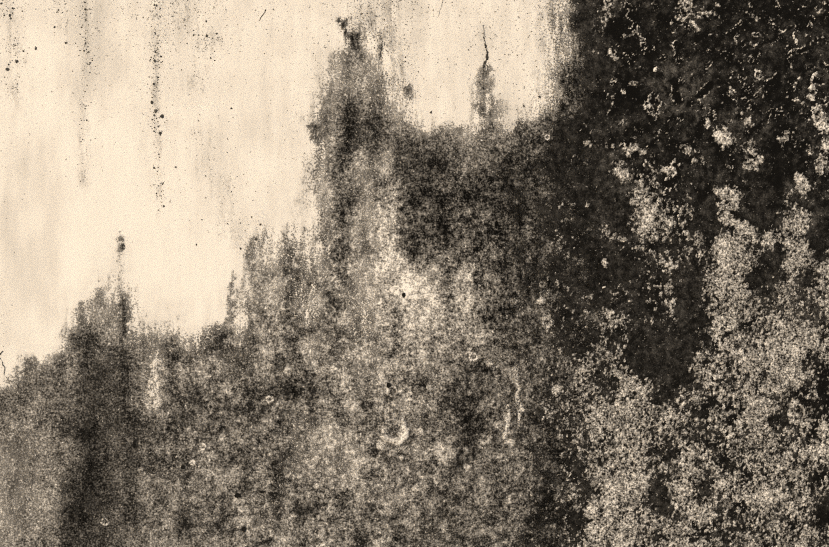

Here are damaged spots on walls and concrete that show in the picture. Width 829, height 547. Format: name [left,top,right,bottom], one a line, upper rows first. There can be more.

water stain [72,2,96,145]
water stain [146,0,221,211]
crack [481,27,489,71]
water stain [631,517,670,547]